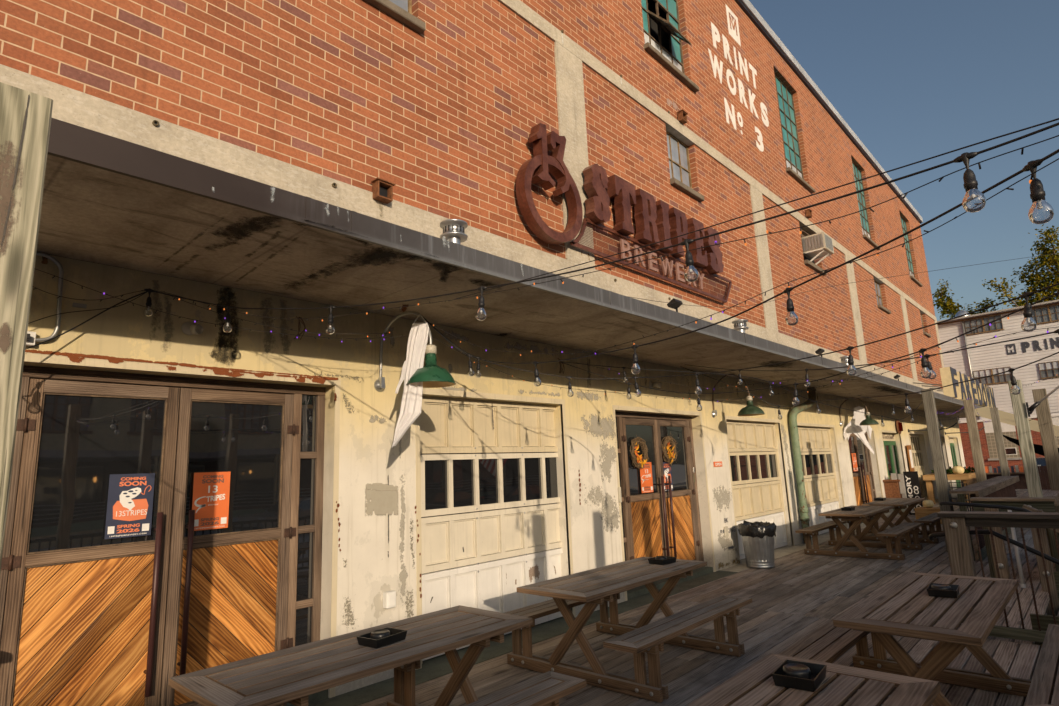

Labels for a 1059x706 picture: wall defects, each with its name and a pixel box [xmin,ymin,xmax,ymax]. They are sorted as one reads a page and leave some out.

water stain [205,217,281,248]
water stain [285,205,460,287]
water stain [211,287,238,365]
peeling [581,414,620,532]
spalling [366,476,408,601]
water stain [405,589,414,617]